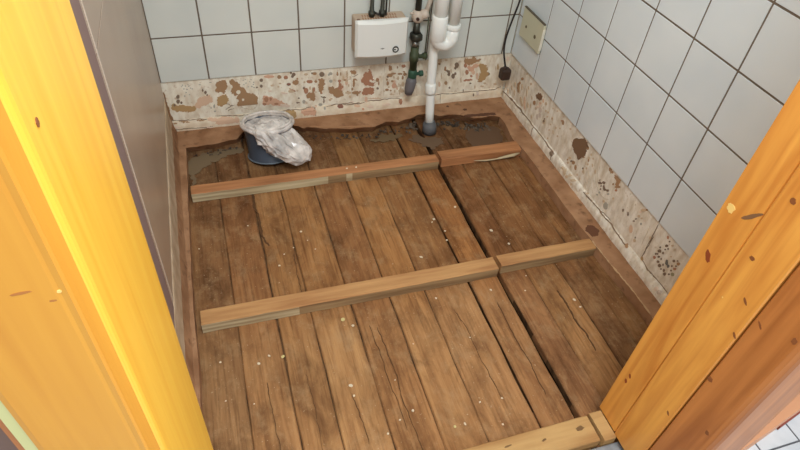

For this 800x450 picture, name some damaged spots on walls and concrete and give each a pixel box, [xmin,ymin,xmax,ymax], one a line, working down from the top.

spalling [171,95,196,113]
spalling [202,79,263,110]
spalling [277,70,360,104]
spalling [376,65,407,91]
spalling [438,56,490,96]
damp [465,126,503,147]
damp [188,147,244,186]
spalling [567,138,589,170]
spalling [598,168,621,192]
crack [583,171,668,294]
spalling [655,241,680,276]